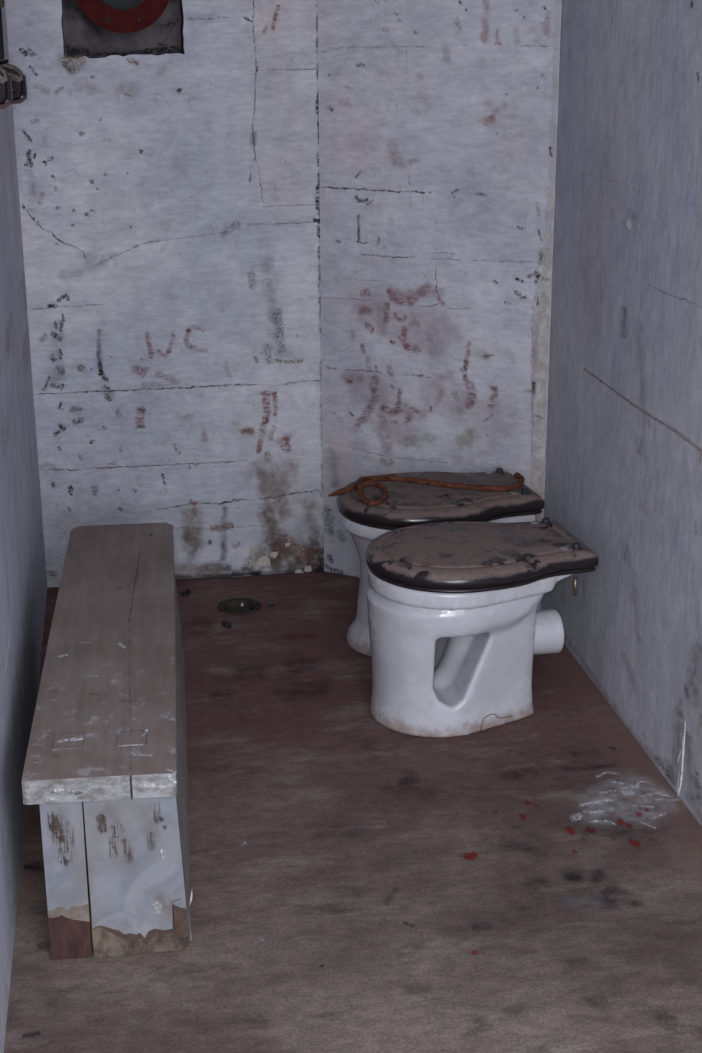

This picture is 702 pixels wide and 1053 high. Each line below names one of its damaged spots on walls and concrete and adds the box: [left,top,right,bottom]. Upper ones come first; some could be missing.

crack [244,1,425,308]